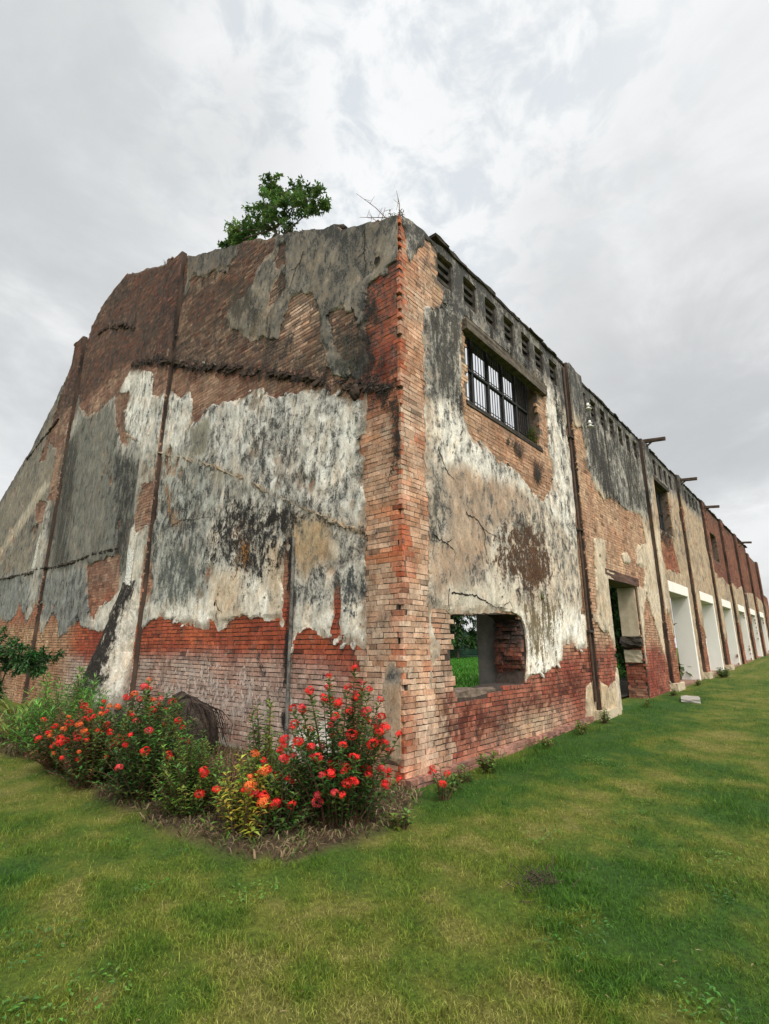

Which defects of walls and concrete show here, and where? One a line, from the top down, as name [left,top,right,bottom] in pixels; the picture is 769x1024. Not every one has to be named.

water stain [197,495,289,602]
flaking render [32,215,681,787]
crack [448,588,513,610]
water stain [434,514,587,757]
water stain [579,407,644,523]